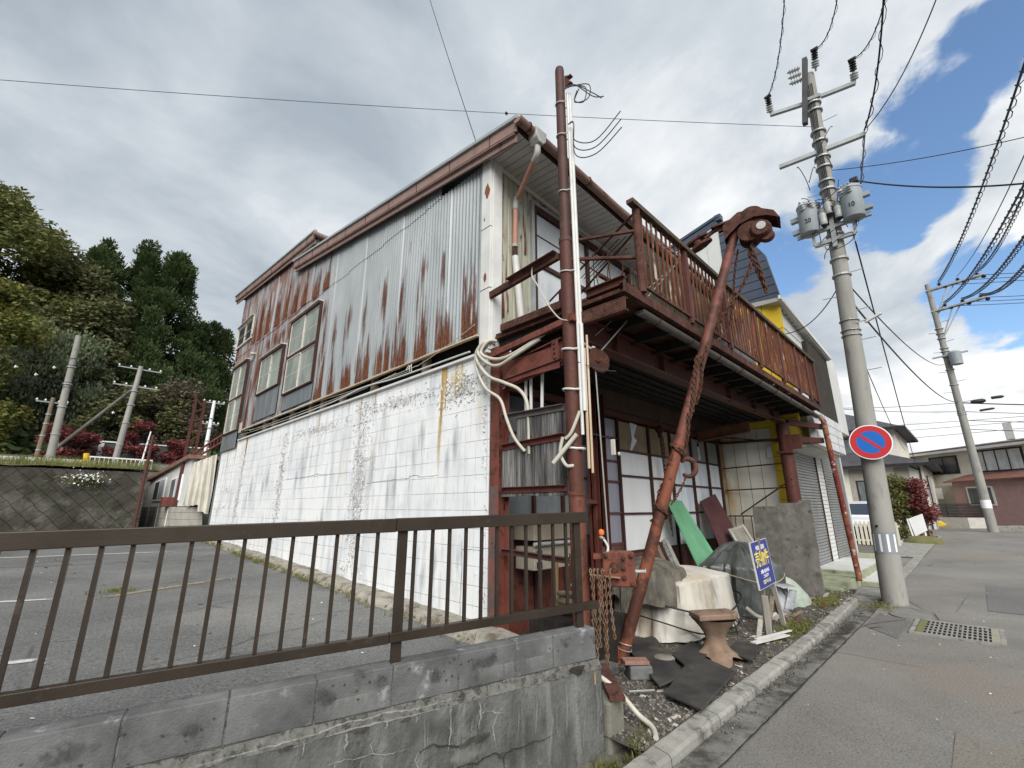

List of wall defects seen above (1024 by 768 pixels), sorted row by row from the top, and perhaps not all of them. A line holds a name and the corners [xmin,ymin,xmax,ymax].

rust [225,253,486,472]
crack [334,708,550,768]